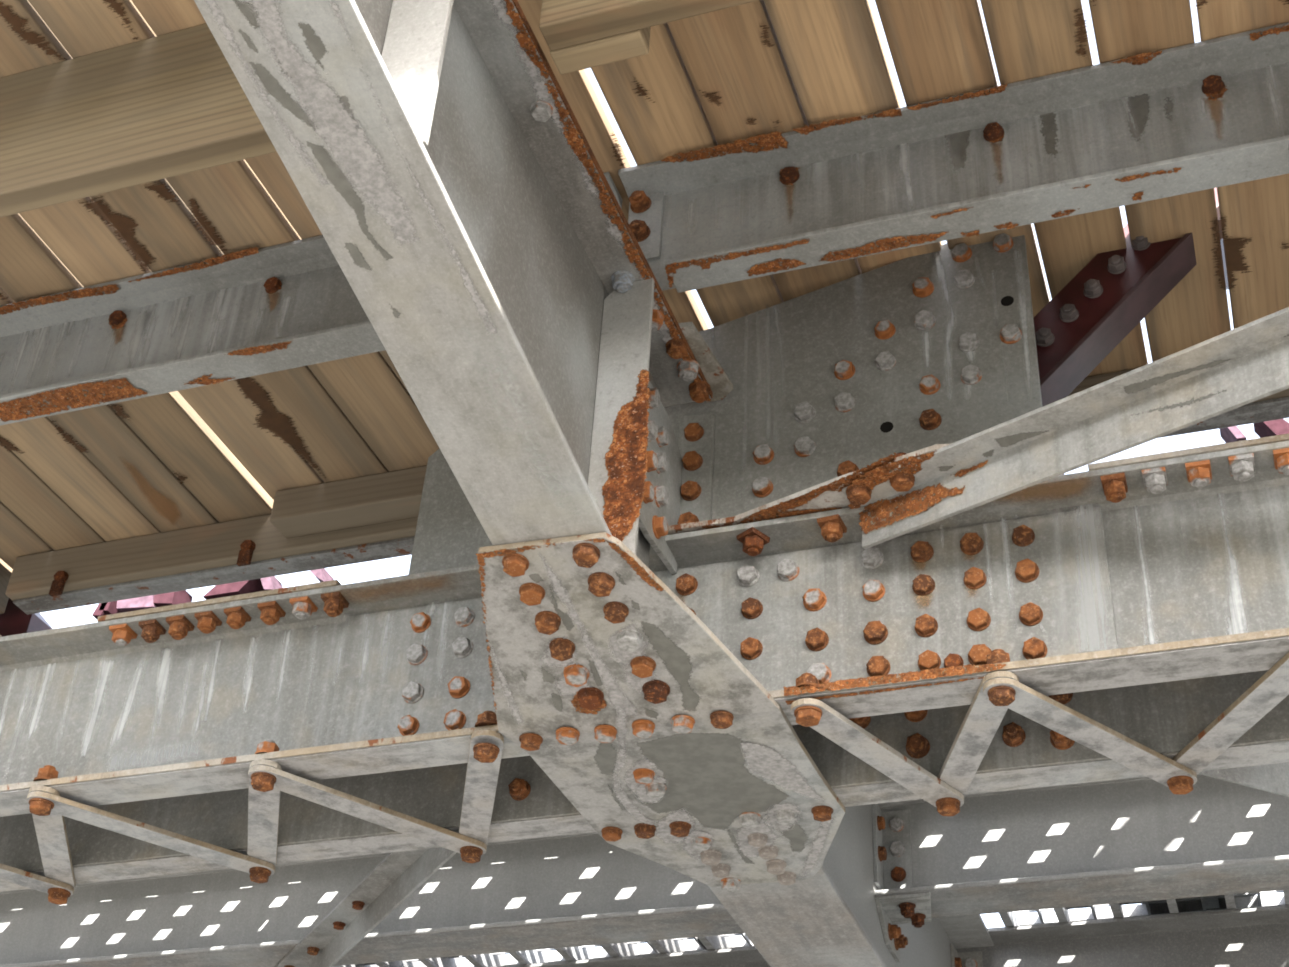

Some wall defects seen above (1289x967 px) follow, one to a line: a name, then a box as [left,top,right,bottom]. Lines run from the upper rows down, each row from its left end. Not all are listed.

rust [1249,25,1289,41]
rust [1110,50,1163,65]
rust [504,0,1019,383]
rust [1115,168,1181,201]
rust [0,247,259,315]
rust [227,341,291,356]
rust [0,378,147,422]
rust [184,374,233,385]
rust [584,369,664,591]
rust [737,450,988,534]
rust [476,543,556,712]
rust [783,664,1006,705]